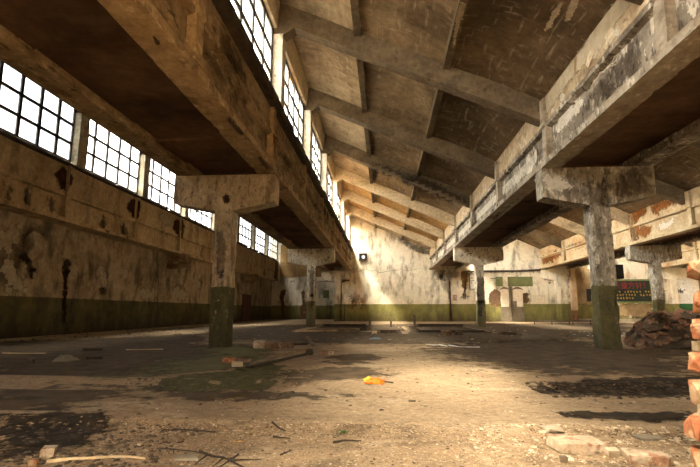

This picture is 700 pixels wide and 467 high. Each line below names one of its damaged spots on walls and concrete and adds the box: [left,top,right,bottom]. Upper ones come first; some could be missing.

flaking render [0,222,37,296]
leakage [61,258,72,326]
flaking render [489,289,501,308]